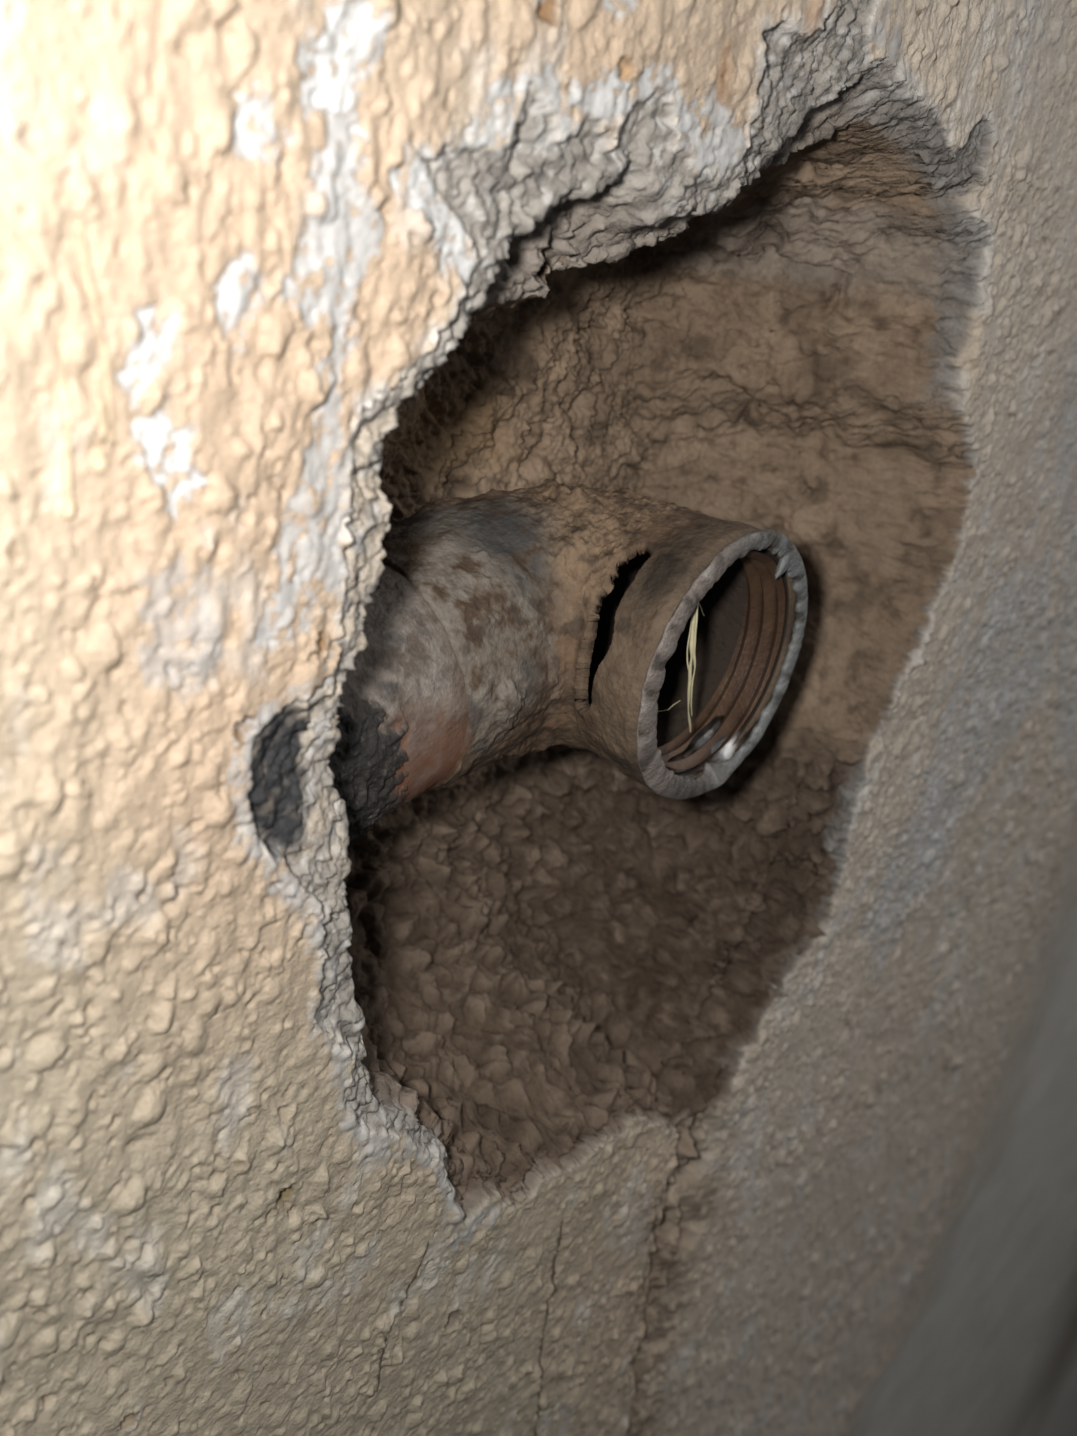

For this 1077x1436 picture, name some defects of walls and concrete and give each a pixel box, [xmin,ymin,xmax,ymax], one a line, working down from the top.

spalling [232,0,995,1226]